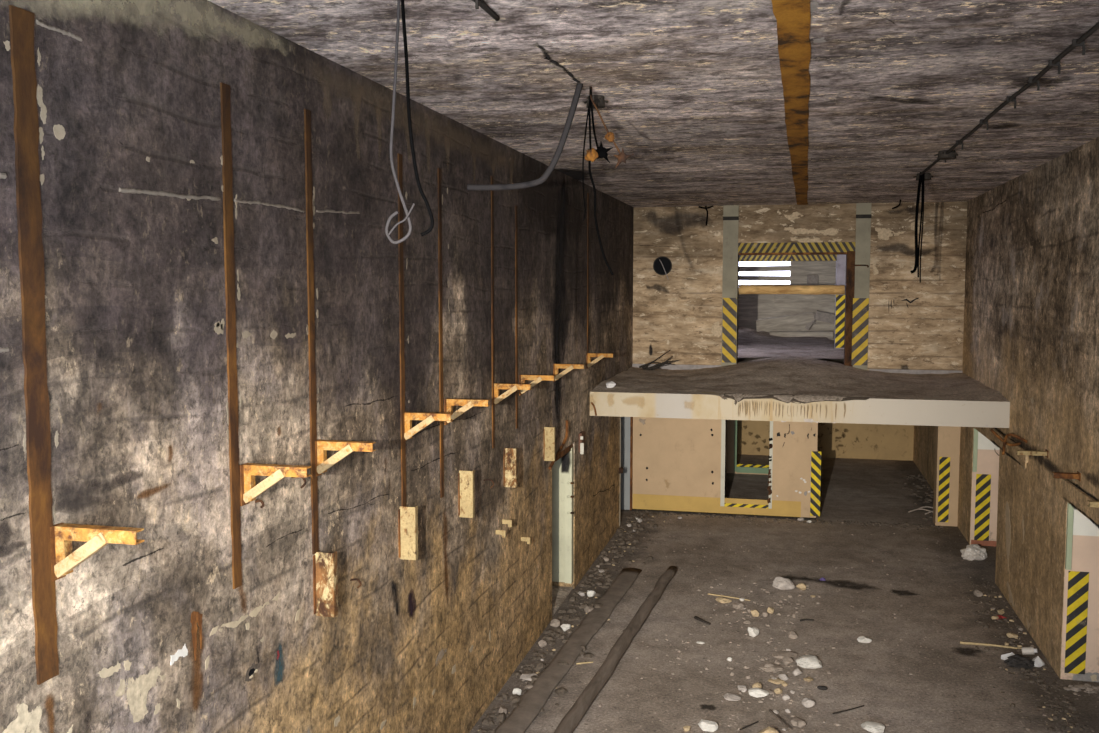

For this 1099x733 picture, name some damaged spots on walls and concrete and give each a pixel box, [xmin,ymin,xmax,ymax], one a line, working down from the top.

spalling [719,393,869,405]